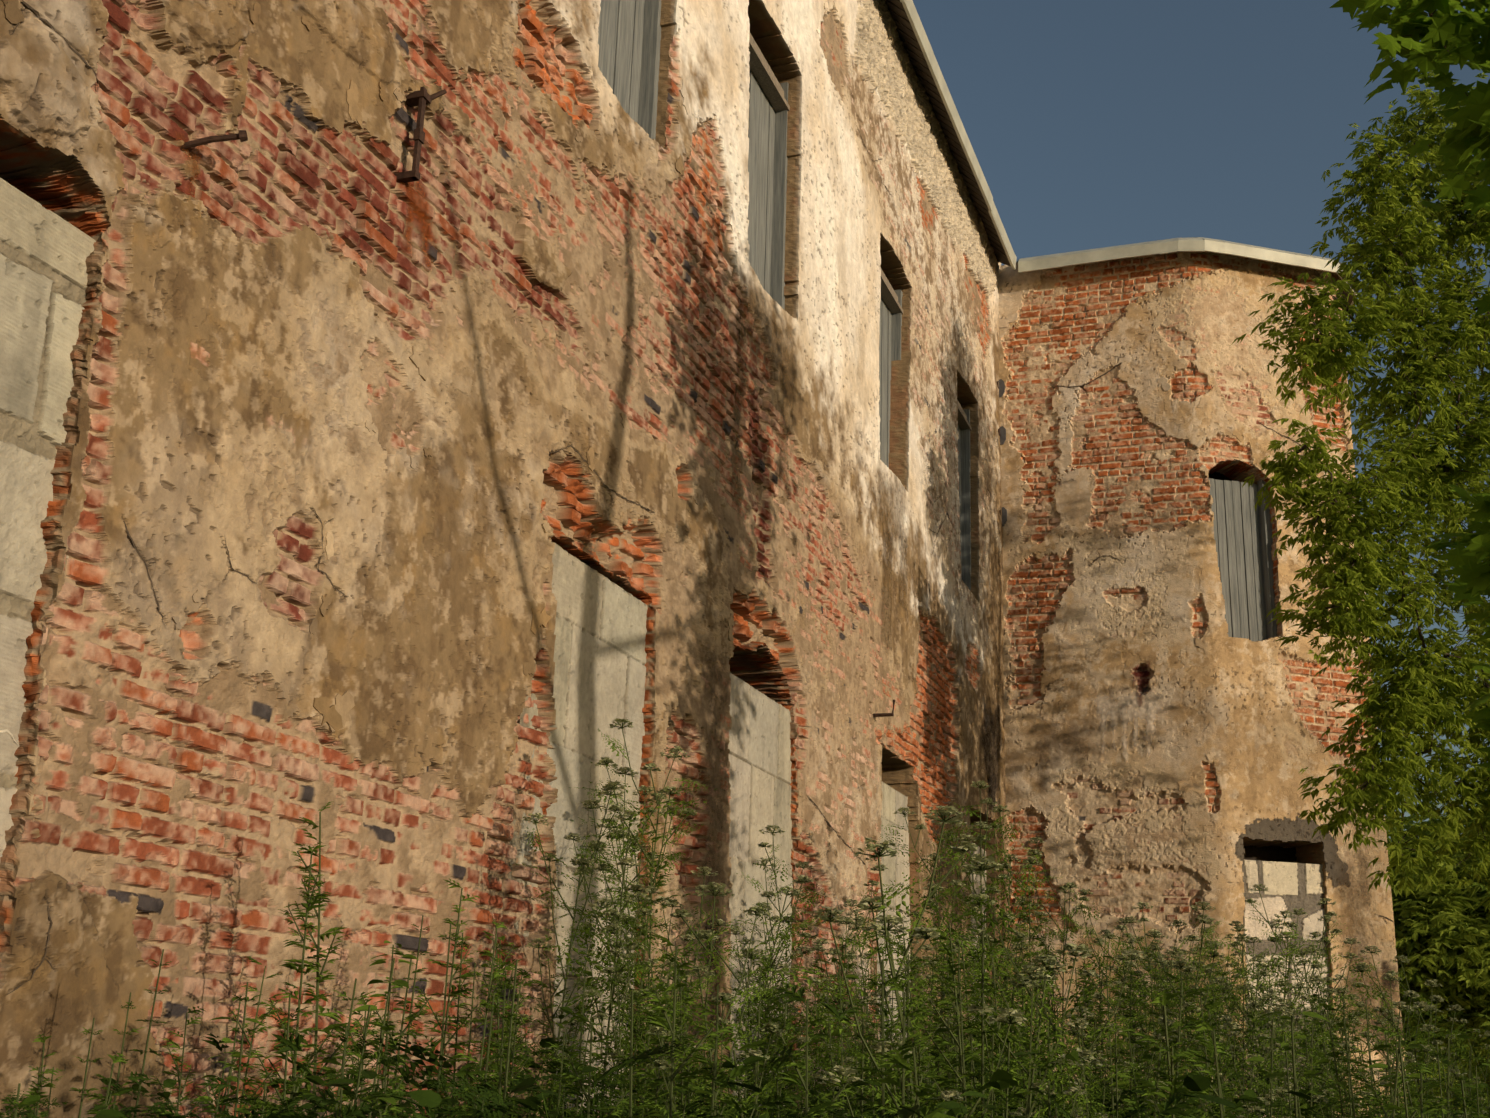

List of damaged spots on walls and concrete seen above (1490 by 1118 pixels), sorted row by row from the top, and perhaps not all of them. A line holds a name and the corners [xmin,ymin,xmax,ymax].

crack [11,0,98,91]
spalling [816,0,1350,711]
crack [123,519,164,623]
crack [224,535,255,583]
spalling [14,0,882,1118]
spalling [875,606,984,853]